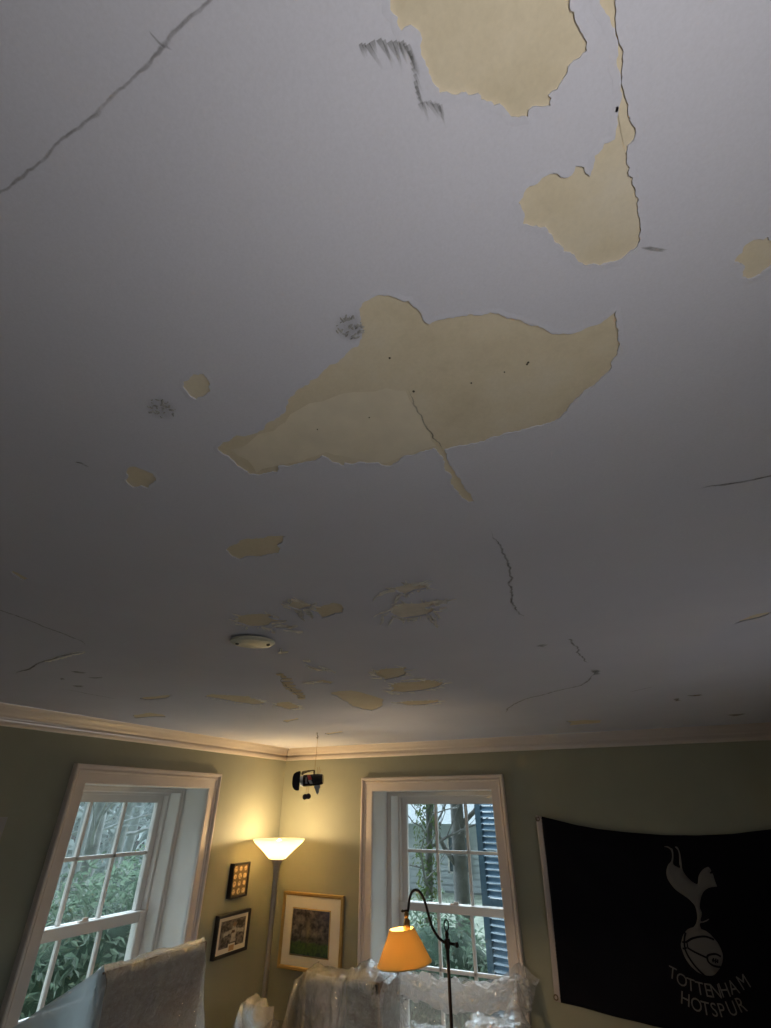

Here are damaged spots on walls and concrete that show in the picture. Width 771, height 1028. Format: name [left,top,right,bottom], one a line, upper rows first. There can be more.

peeling [382,0,648,271]
peeling [728,232,771,284]
peeling [214,290,625,504]
peeling [330,678,449,711]